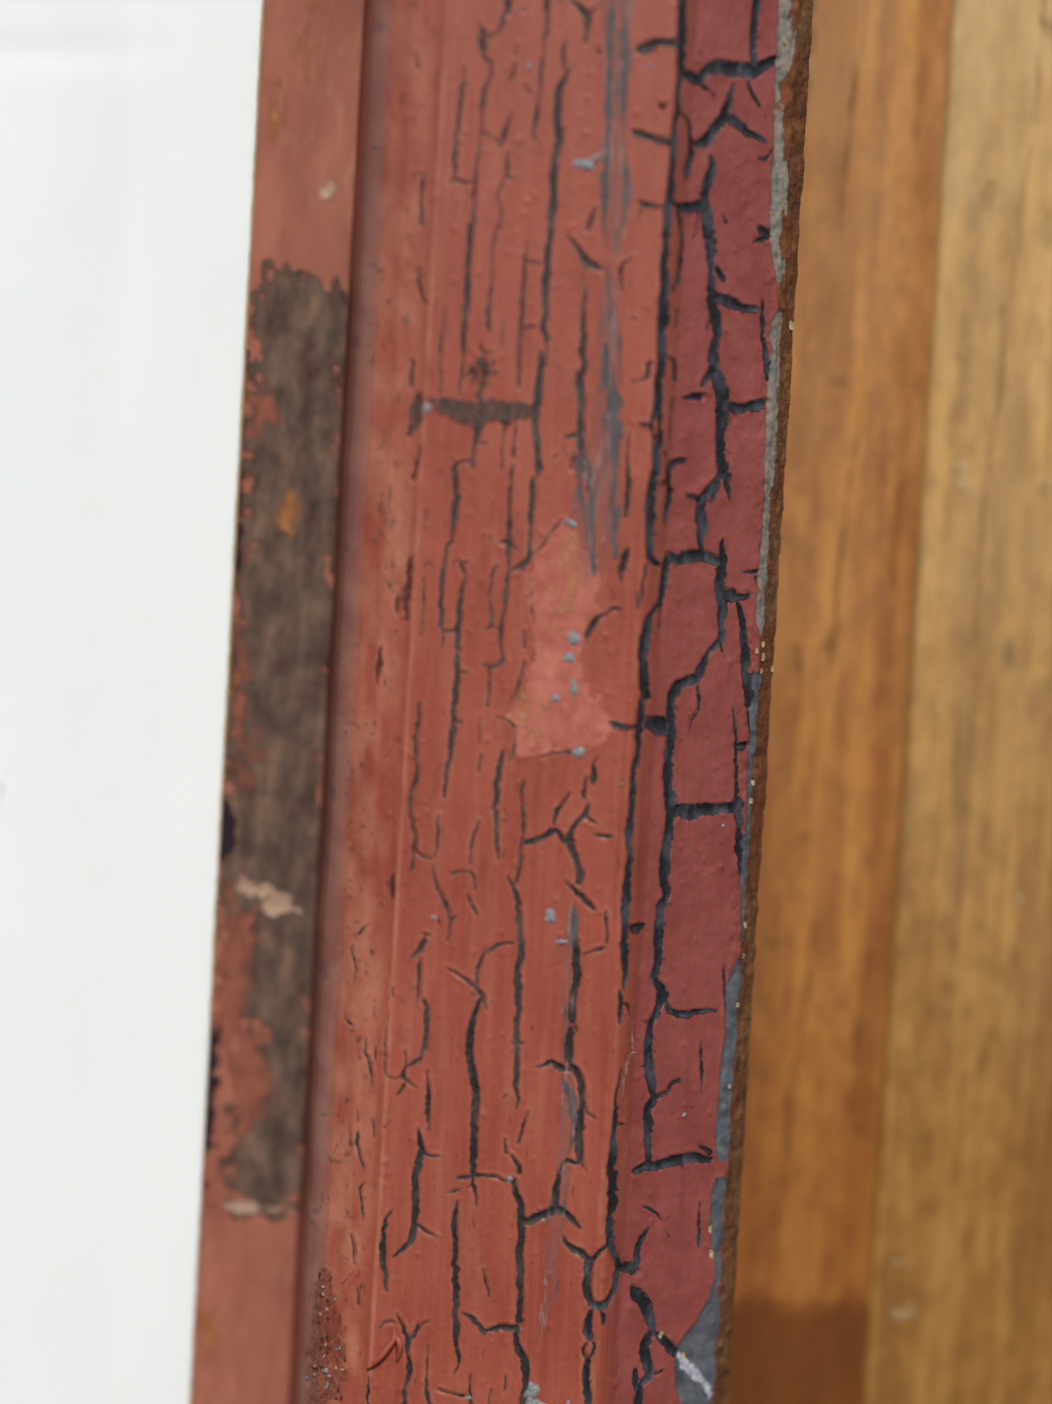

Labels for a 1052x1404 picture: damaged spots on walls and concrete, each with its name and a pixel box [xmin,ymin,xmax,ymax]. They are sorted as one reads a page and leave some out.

crack [346,0,775,1404]
peeling [505,517,618,759]
peeling [740,672,762,941]
peeling [674,958,742,1404]